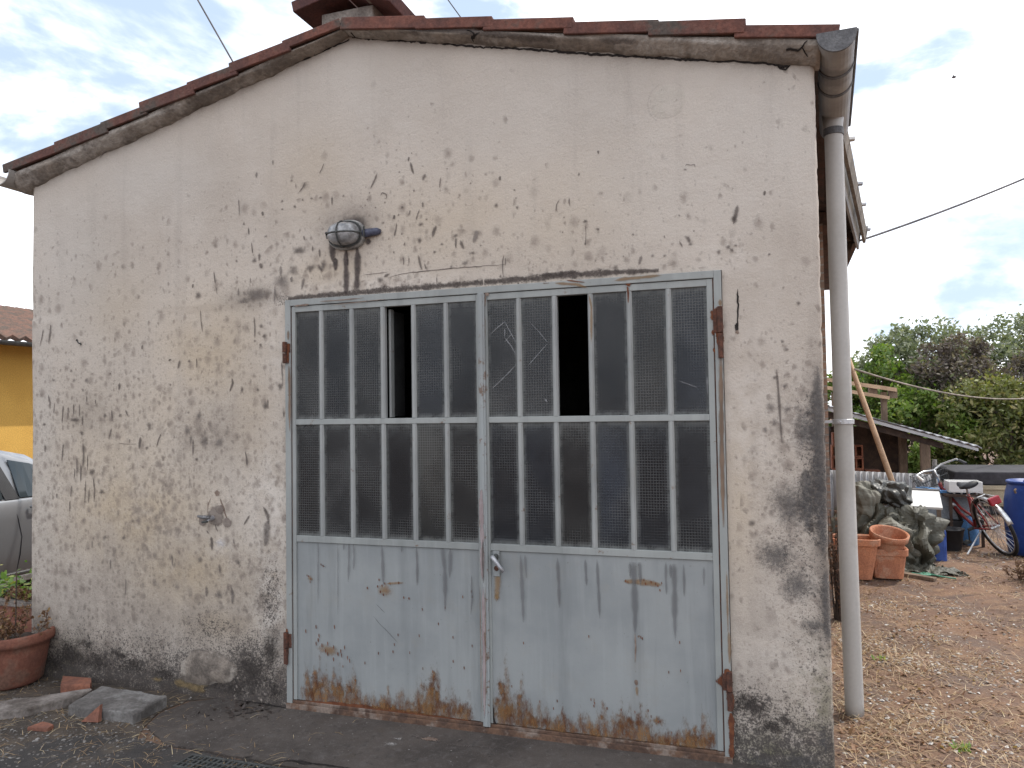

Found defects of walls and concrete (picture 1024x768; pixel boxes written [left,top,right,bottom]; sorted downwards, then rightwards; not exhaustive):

crack [296,30,808,68]
leakage [274,236,665,300]
leakage [764,367,830,550]
leakage [759,540,832,637]
leakage [49,640,142,672]
rust [302,671,471,721]
rust [493,674,714,749]